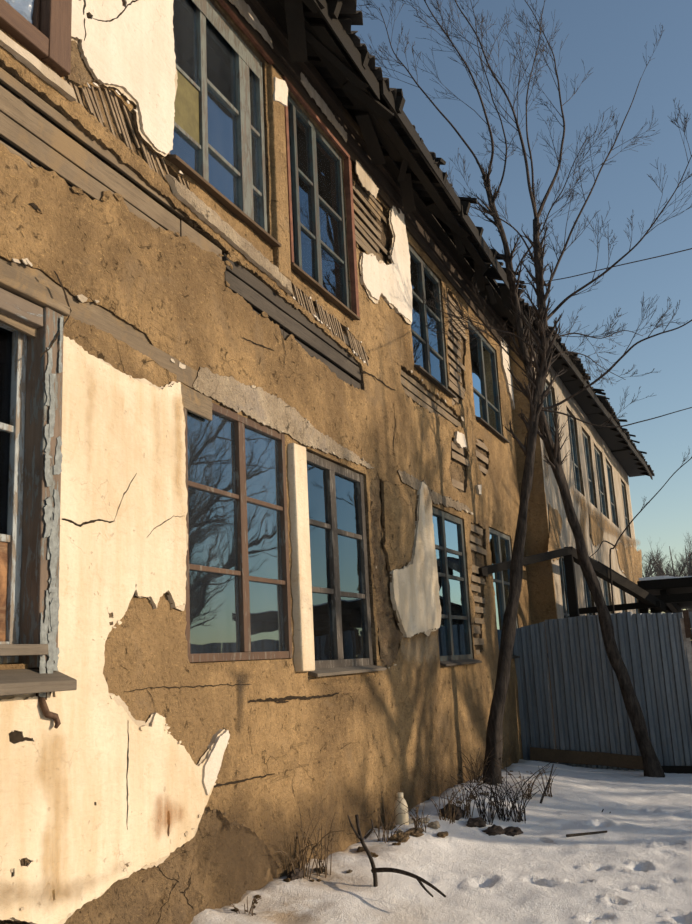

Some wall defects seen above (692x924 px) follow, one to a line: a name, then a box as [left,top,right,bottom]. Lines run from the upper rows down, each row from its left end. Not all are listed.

crack [83,0,138,22]
peeling [0,67,369,389]
flaking render [400,293,489,493]
crack [62,480,132,527]
peeling [39,316,186,674]
spalling [9,730,36,744]
peeling [103,596,241,795]
crack [124,684,339,703]
crack [214,773,275,788]
spalling [64,808,277,924]